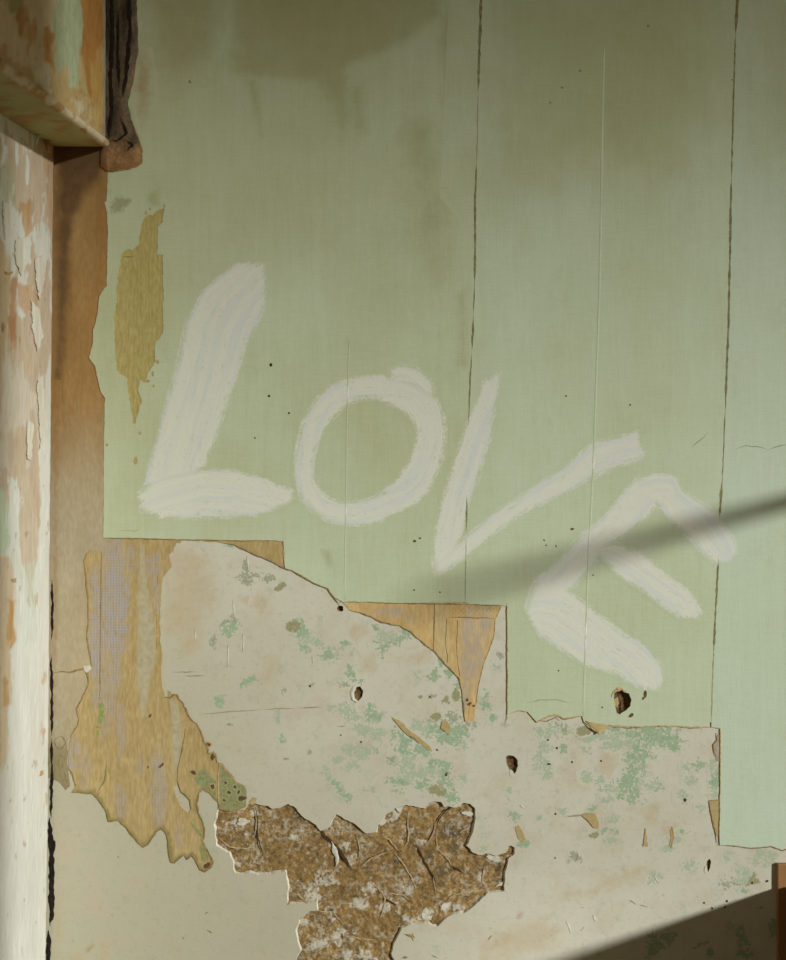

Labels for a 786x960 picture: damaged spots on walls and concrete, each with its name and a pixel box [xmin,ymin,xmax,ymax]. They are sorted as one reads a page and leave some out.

peeling [31,255,45,351]
peeling [114,204,165,435]
peeling [27,380,48,460]
peeling [231,554,289,593]
peeling [282,619,301,634]
spalling [214,658,533,960]
peeling [531,720,720,814]
peeling [654,928,680,950]